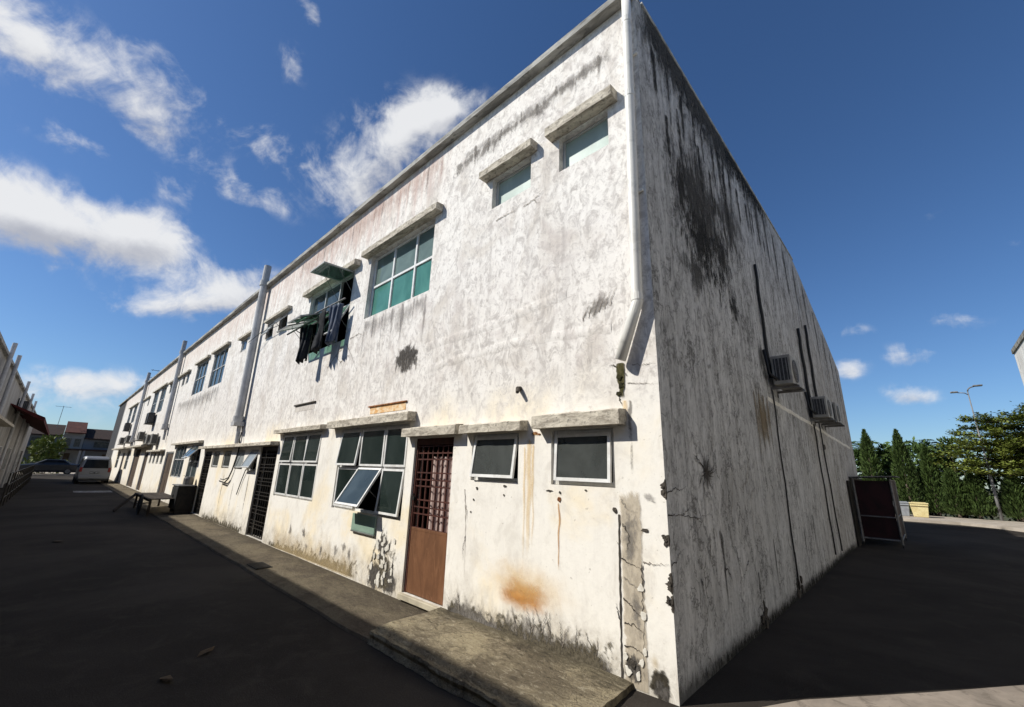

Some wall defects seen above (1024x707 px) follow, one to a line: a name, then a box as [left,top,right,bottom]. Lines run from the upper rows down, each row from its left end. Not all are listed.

water stain [641,6,843,408]
water stain [395,346,418,372]
water stain [202,514,242,532]
water stain [268,526,357,577]
peeling [367,530,396,595]
corrosion [508,583,539,608]
crack [612,507,623,678]
crack [668,395,765,610]
water stain [447,594,612,672]